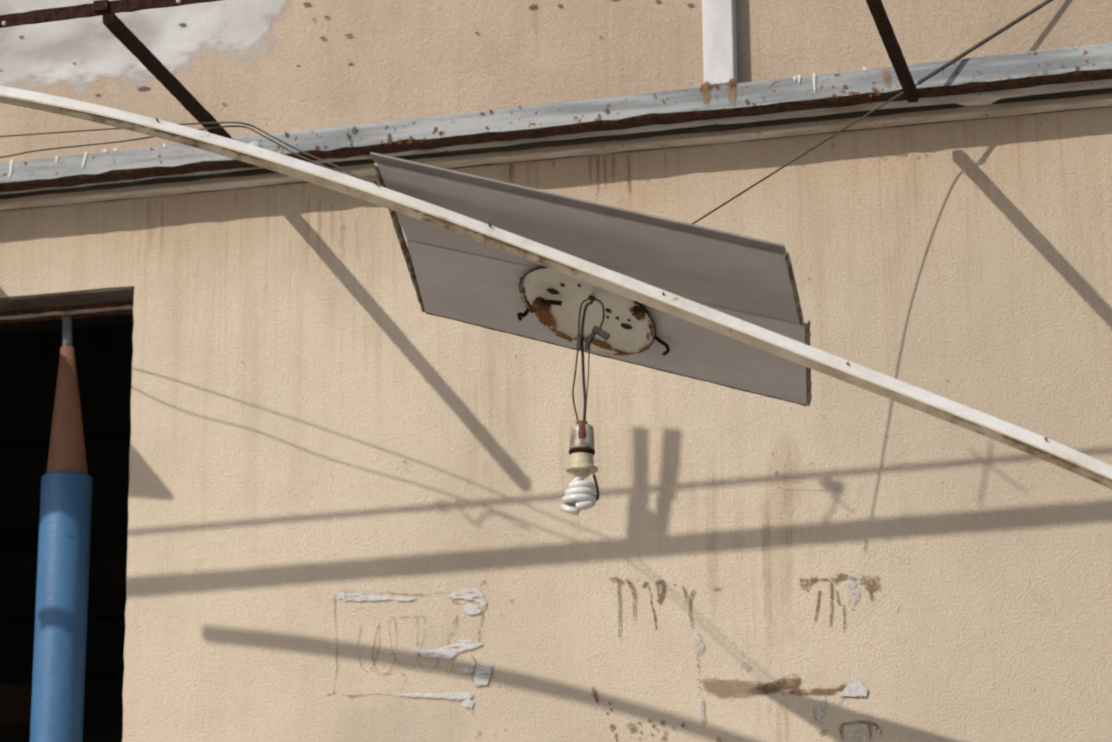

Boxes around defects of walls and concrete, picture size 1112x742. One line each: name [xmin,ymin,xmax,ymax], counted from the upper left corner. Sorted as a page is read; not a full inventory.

rust [0,0,222,28]
peeling [0,0,288,96]
rust [699,78,763,106]
rust [61,108,256,159]
rust [414,209,577,271]
rust [520,277,654,356]
peeling [592,686,685,742]
peeling [814,679,868,721]
spalling [839,720,882,742]